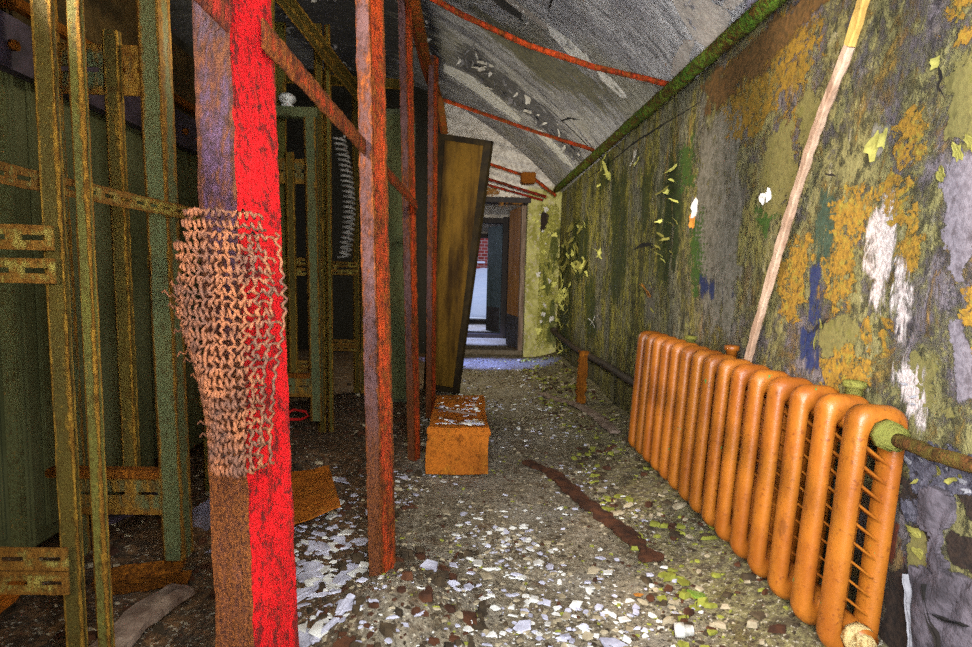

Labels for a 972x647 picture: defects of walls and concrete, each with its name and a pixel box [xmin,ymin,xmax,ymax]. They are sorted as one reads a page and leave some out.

water stain [700,0,828,116]
water stain [585,276,597,337]
water stain [610,166,627,306]
water stain [641,169,651,235]
water stain [664,132,697,287]
water stain [699,274,733,299]
flaking render [639,0,830,342]
flaking render [776,0,972,431]
water stain [862,190,914,344]
flaking render [878,451,972,647]